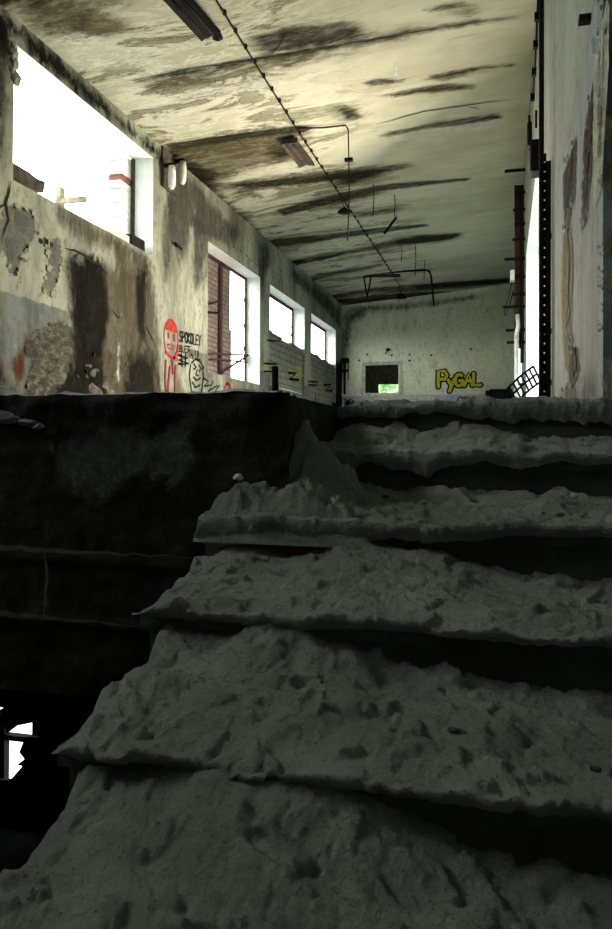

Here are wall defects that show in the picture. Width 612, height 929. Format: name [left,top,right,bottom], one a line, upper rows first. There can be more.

water stain [433,4,499,30]
water stain [0,0,469,285]
water stain [365,63,496,101]
water stain [384,114,502,140]
peeling [561,0,612,399]
peeling [0,204,66,298]
water stain [54,210,161,395]